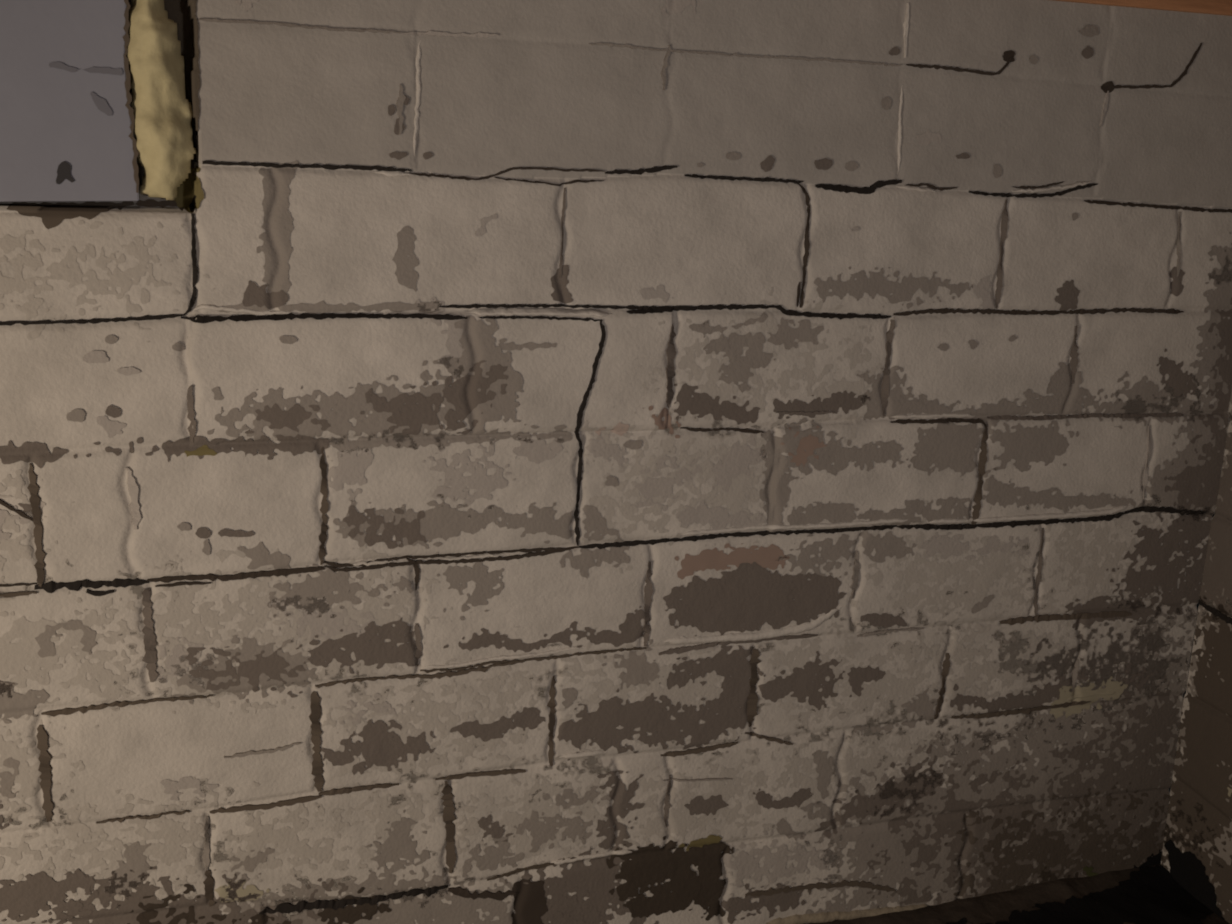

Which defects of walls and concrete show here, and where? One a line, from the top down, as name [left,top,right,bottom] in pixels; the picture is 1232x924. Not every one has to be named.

crack [1106,43,1202,89]
damp [388,95,410,135]
damp [389,151,407,160]
damp [760,155,775,172]
damp [815,158,858,171]
damp [175,166,204,230]
crack [0,160,1232,598]
crack [999,611,1132,625]
crack [1199,601,1232,624]